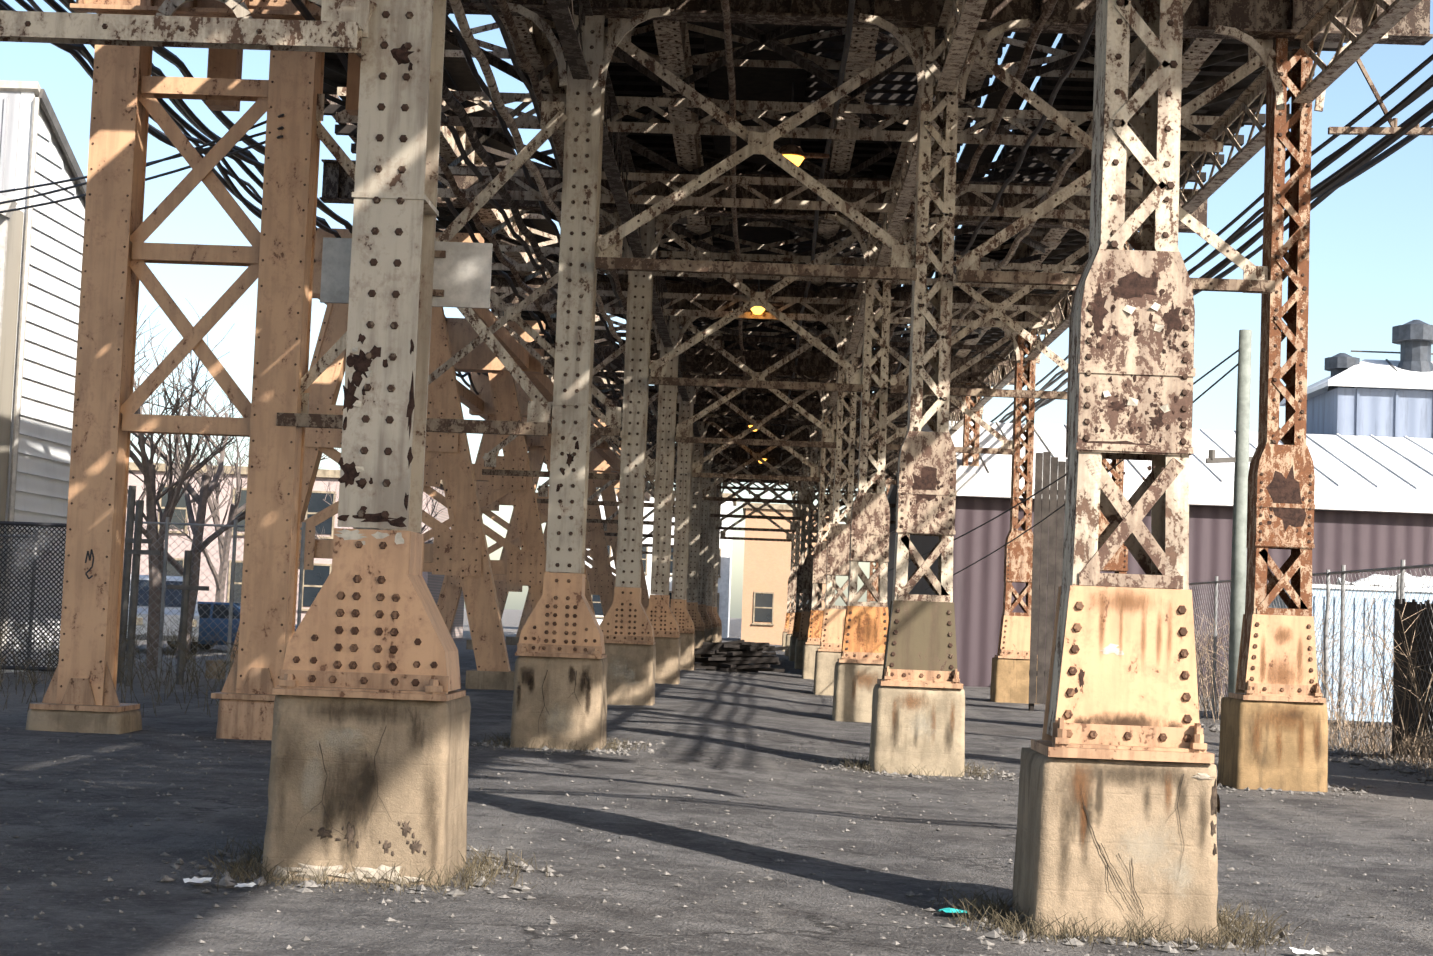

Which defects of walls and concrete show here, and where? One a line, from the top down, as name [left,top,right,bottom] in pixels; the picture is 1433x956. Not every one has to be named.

peeling [1088,271,1182,354]
leakage [517,670,534,704]
leakage [569,668,590,711]
leakage [324,768,373,852]
leakage [1068,768,1169,838]
leakage [1179,789,1206,833]